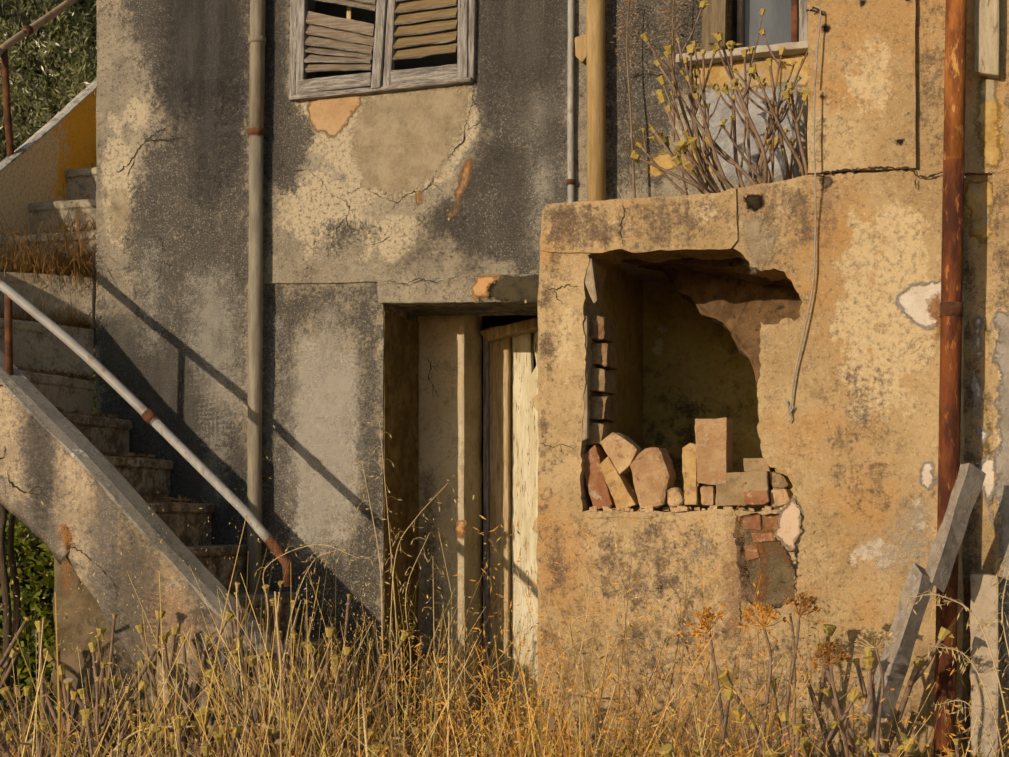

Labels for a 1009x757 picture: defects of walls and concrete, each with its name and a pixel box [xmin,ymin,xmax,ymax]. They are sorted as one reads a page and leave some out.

crack [118,126,198,185]
water stain [155,0,250,208]
crack [282,95,486,246]
flaking render [306,84,469,204]
flaking render [447,158,473,221]
spalling [471,273,539,304]
crack [0,447,53,501]
flaking render [736,497,803,608]
flaking render [970,310,1009,696]